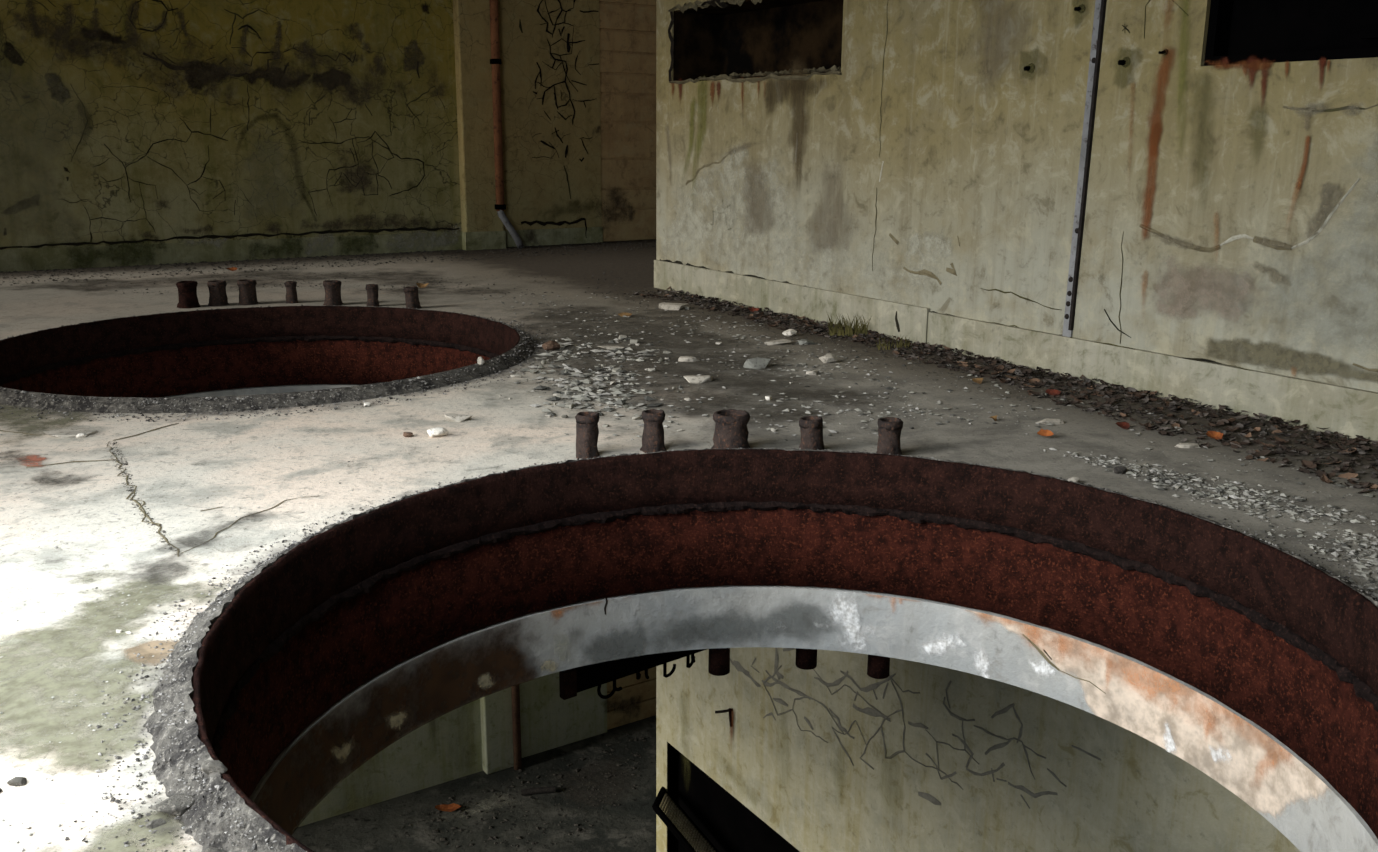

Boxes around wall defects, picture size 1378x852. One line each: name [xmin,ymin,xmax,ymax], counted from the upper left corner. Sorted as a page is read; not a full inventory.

crack [0,0,459,250]
crack [519,0,599,238]
leakage [766,66,822,166]
rust [1143,50,1173,238]
rust [1212,58,1289,102]
rust [1296,136,1310,189]
crack [0,423,315,557]
crack [730,648,1101,809]
rust [1124,666,1181,700]